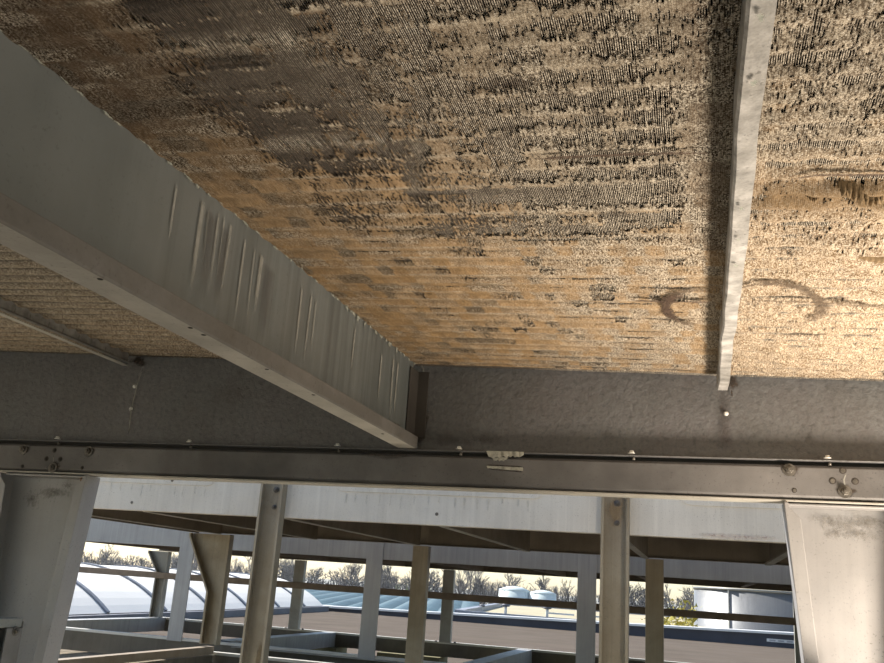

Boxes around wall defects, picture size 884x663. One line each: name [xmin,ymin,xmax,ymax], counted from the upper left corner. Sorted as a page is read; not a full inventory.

damp [184,173,232,277]
damp [238,244,263,298]
damp [633,289,709,325]
damp [742,280,884,323]